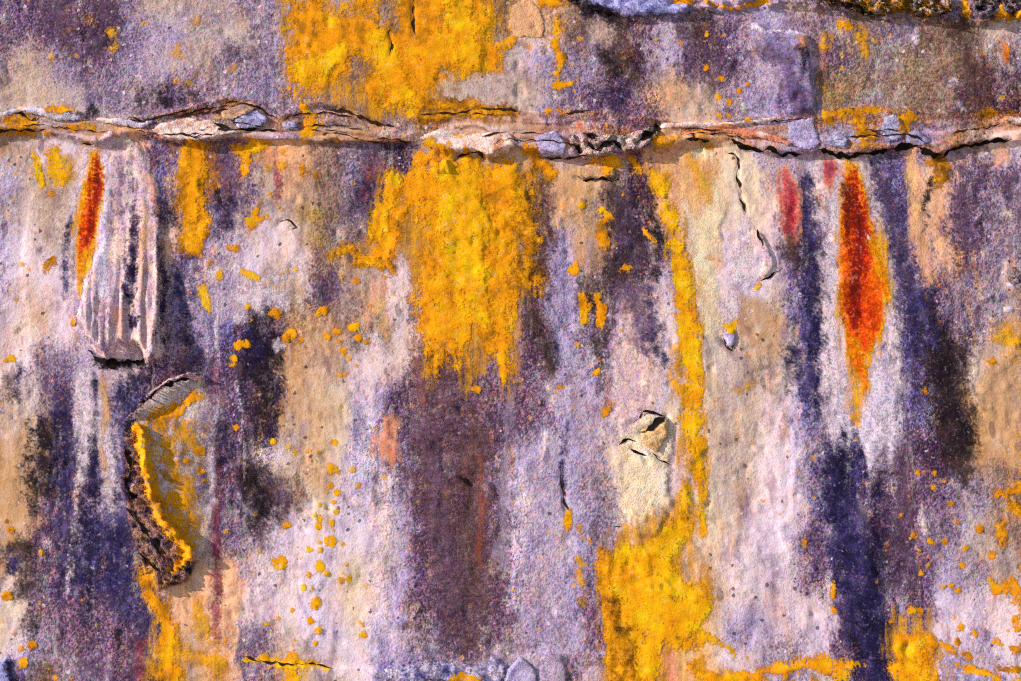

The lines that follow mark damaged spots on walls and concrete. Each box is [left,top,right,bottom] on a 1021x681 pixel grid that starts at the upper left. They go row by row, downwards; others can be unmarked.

rust [70,149,108,298]
crack [0,101,411,145]
crack [216,186,229,215]
peeling [568,0,689,30]
crack [421,107,1021,249]
rust [776,166,803,260]
spalling [816,0,1021,22]
leakage [947,18,989,114]
rust [822,154,895,428]
flaking render [120,372,219,590]
flaking render [612,413,674,534]
leakage [779,158,981,681]